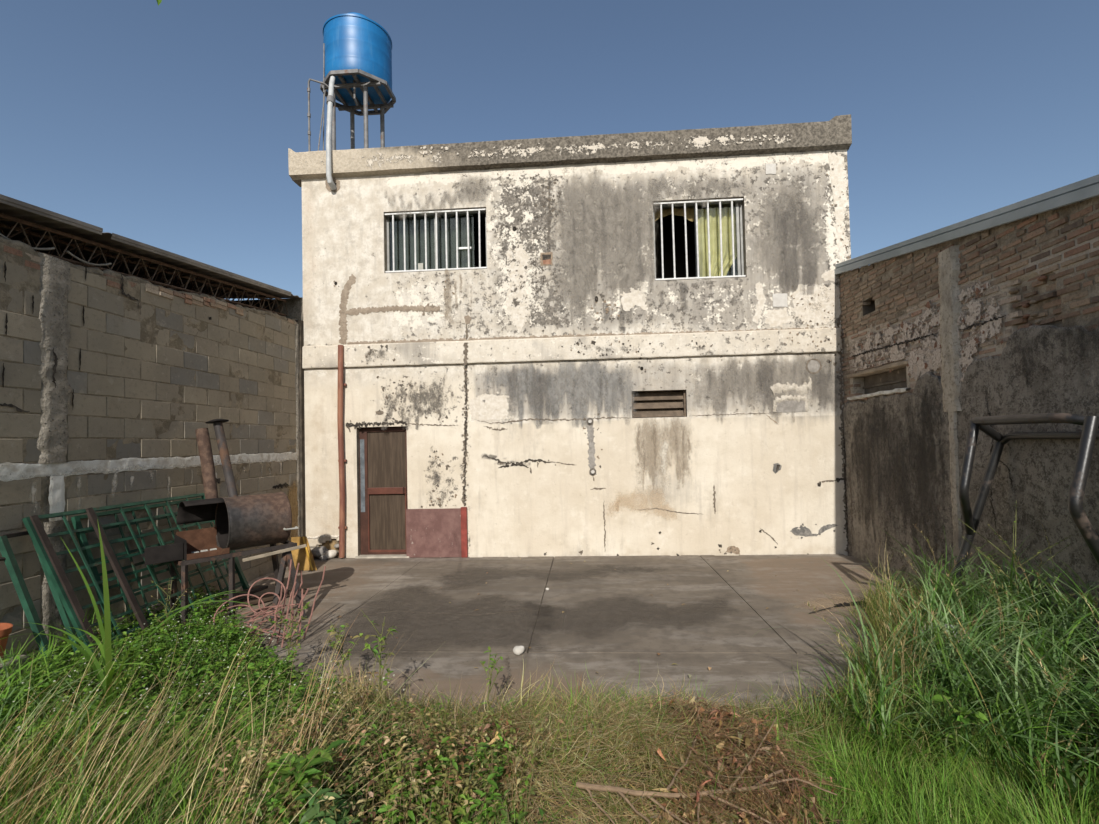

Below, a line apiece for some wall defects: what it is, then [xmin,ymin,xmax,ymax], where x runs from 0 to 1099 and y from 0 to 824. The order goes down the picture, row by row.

peeling [379,144,521,160]
water stain [541,173,666,325]
flaking render [752,151,942,381]
flaking render [957,280,1003,384]
crack [0,403,30,412]
mould [376,375,448,430]
crack [346,315,627,506]
water stain [497,347,631,426]
crack [692,410,771,418]
water stain [705,352,831,416]
water stain [637,423,687,481]
flaking render [791,523,837,539]